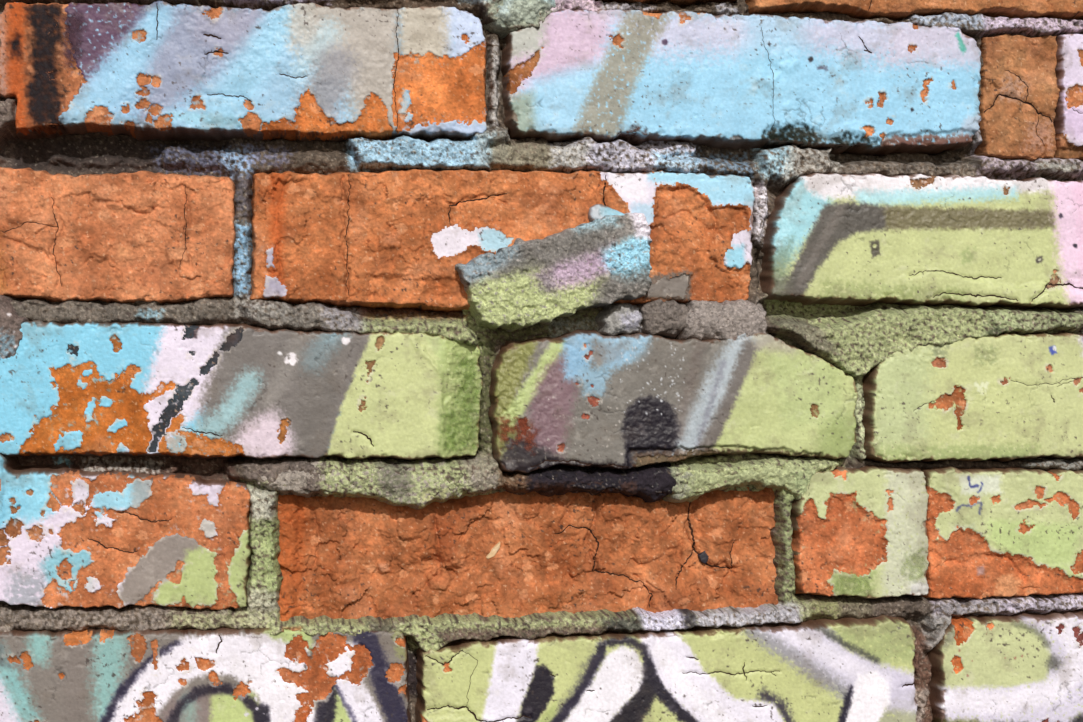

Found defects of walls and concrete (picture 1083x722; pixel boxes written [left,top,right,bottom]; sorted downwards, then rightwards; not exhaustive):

peeling [0,2,87,136]
peeling [238,34,487,141]
crack [984,70,1079,146]
spalling [0,167,236,304]
spalling [250,169,630,312]
spalling [614,170,751,305]
crack [910,270,1083,301]
peeling [0,325,246,458]
peeling [0,470,251,610]
crack [554,502,734,607]
peeling [791,489,894,596]
spalling [922,486,1083,599]